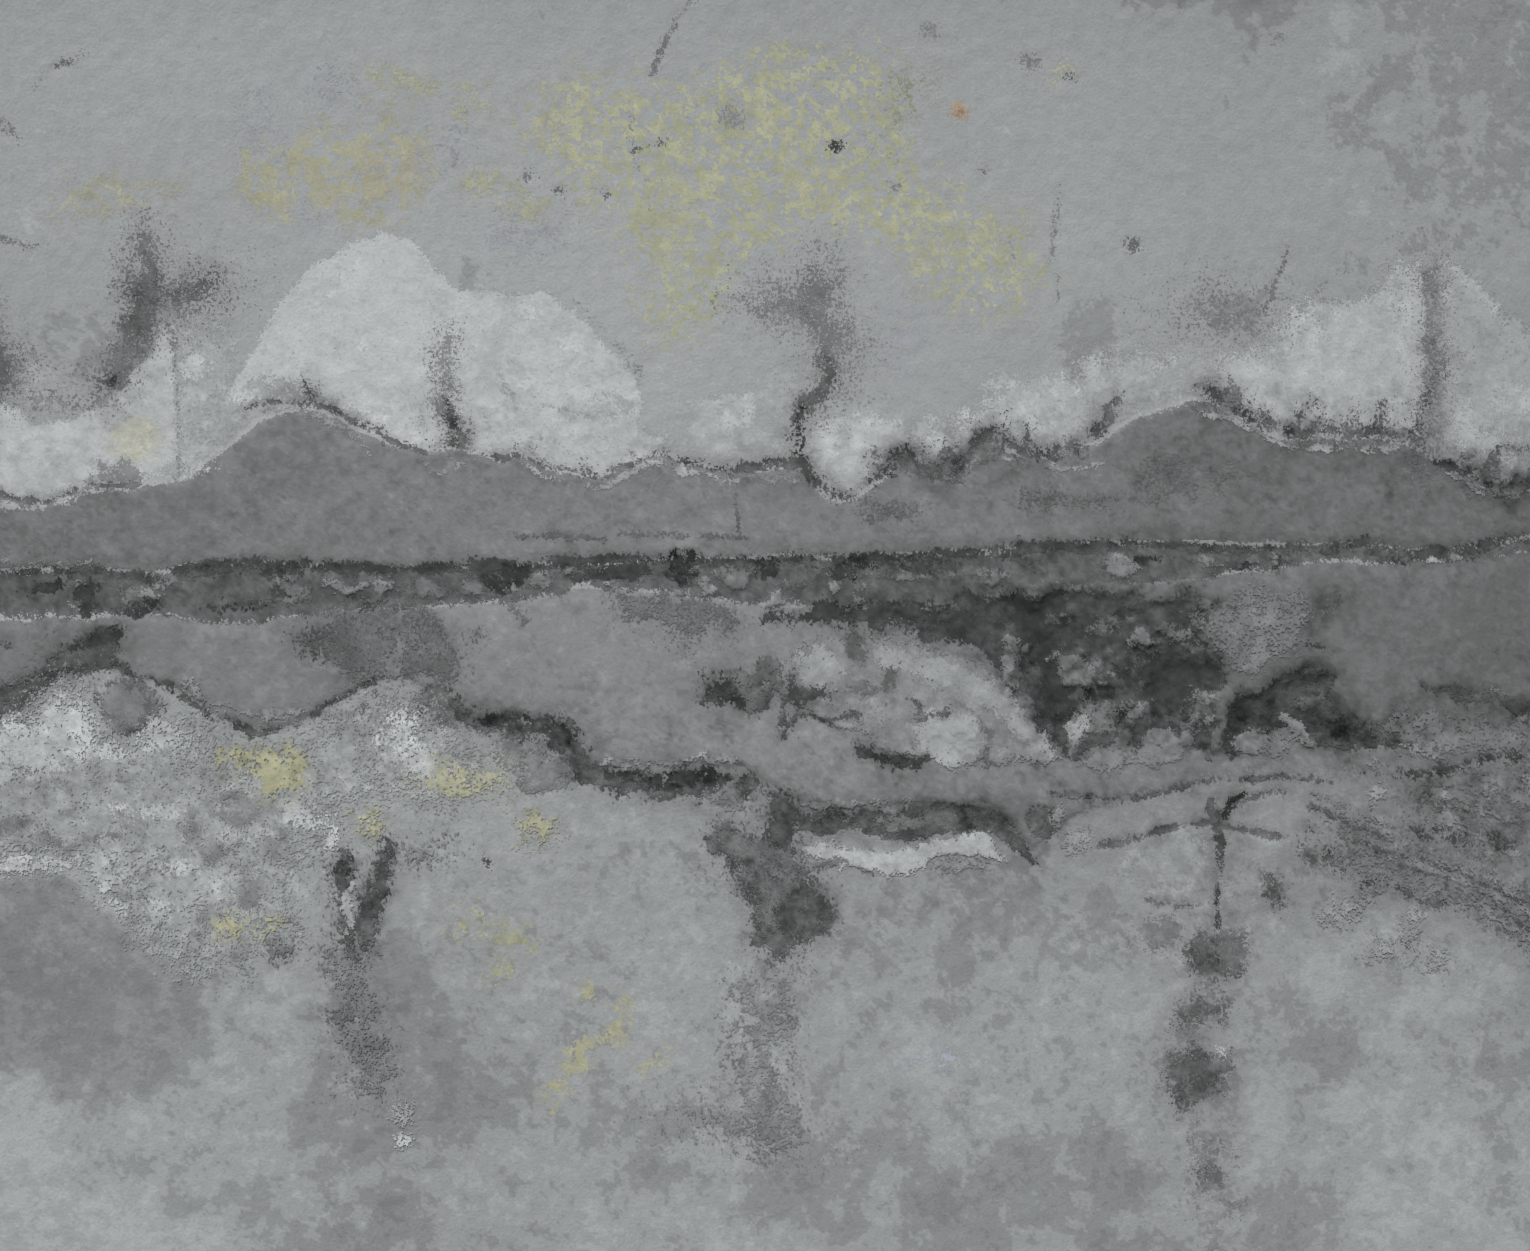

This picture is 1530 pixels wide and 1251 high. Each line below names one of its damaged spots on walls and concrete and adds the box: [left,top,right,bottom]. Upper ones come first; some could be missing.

damp [0,7,1530,504]
crack [0,372,1530,628]
crack [0,673,63,720]
crack [146,674,381,742]
damp [0,576,570,1151]
spalling [412,679,759,816]
damp [527,974,644,1116]
damp [614,775,880,1183]
peeling [695,580,1530,988]
damp [1117,867,1294,1251]
damp [1291,820,1455,912]
damp [1352,756,1530,870]